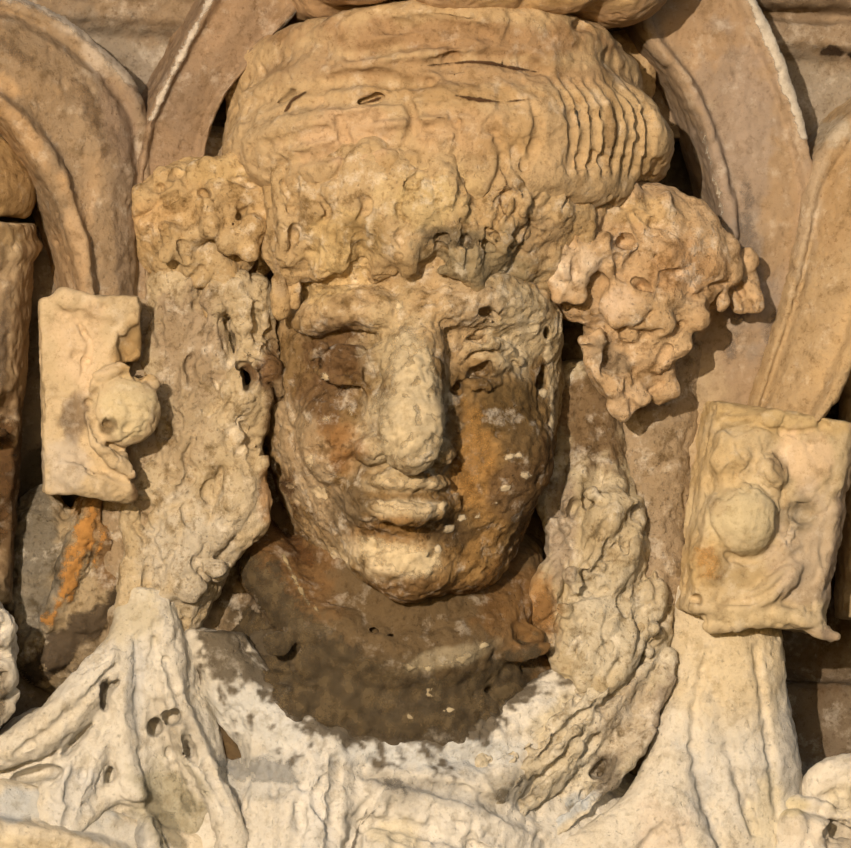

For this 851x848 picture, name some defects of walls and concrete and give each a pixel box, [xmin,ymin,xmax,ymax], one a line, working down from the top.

rust [459,400,491,506]
rust [40,506,107,626]
leakage [231,554,541,741]